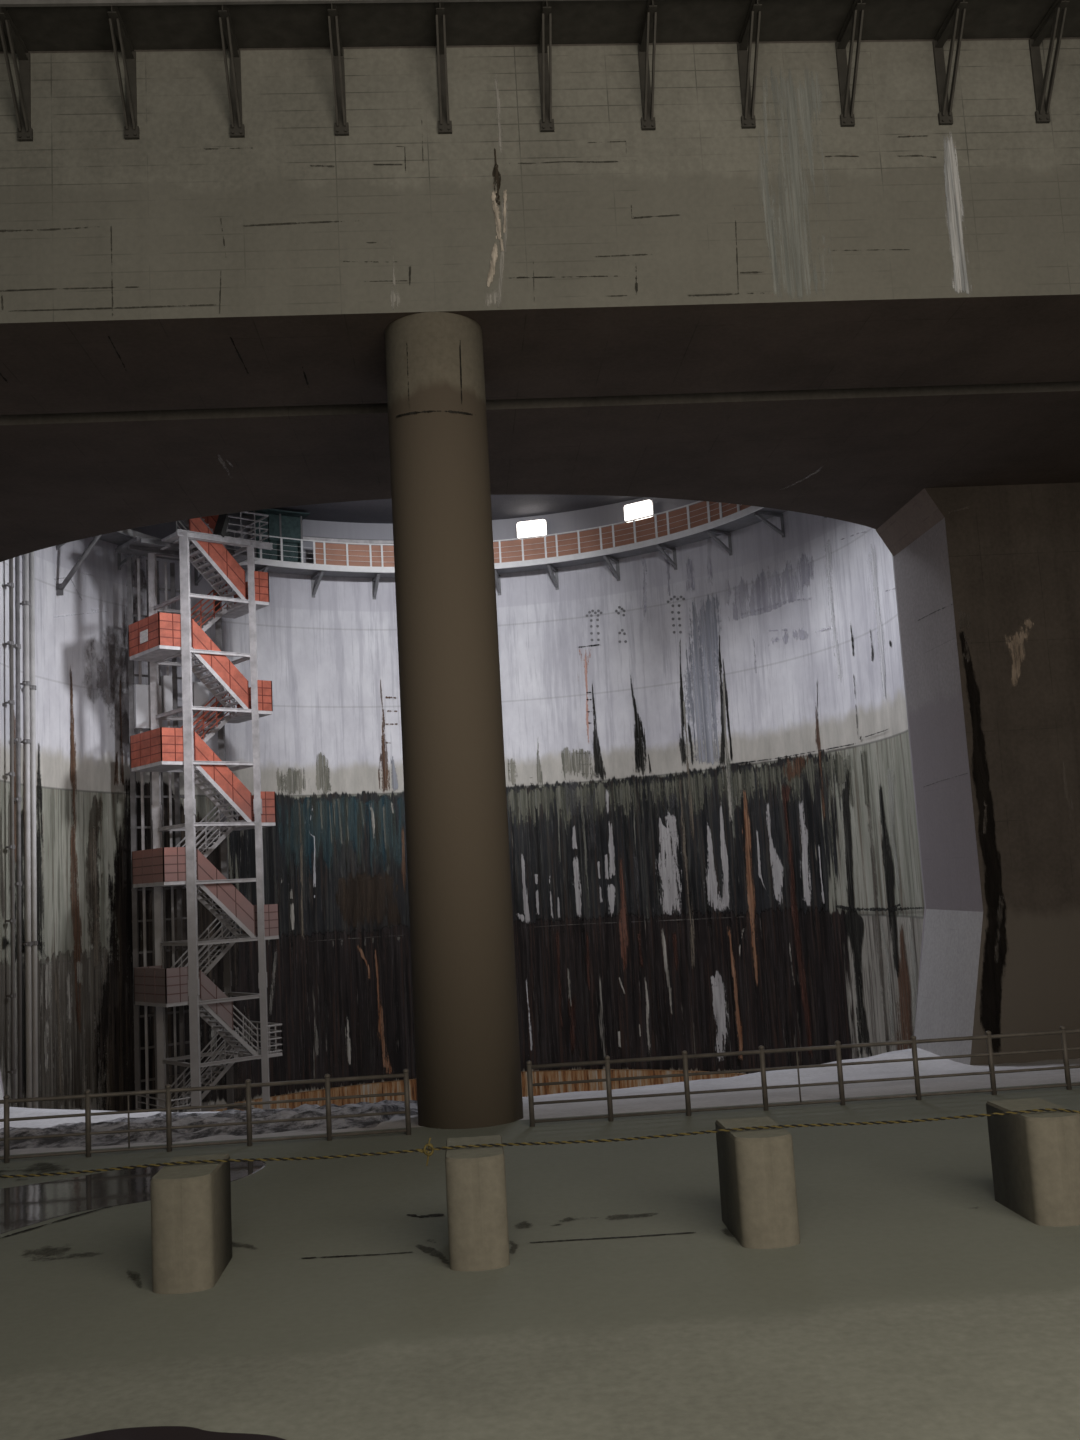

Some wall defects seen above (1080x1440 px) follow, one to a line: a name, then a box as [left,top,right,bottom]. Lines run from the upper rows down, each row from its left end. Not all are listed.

leakage [944,137,972,294]
leakage [508,743,636,927]
rust [619,859,628,970]
leakage [655,594,744,1013]
rust [742,791,758,987]
leakage [756,780,836,906]
leakage [861,752,894,1052]
rust [358,945,392,1074]
leakage [639,981,651,1050]
leakage [710,971,729,1061]
rust [728,930,743,1061]